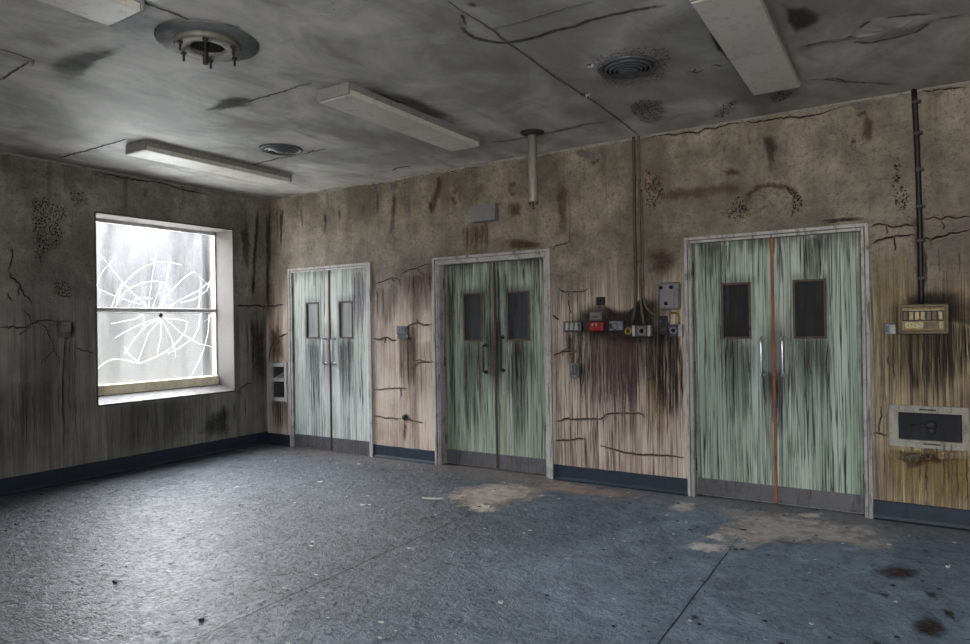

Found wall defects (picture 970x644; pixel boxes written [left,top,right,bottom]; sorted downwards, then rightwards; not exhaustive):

crack [0,247,212,374]